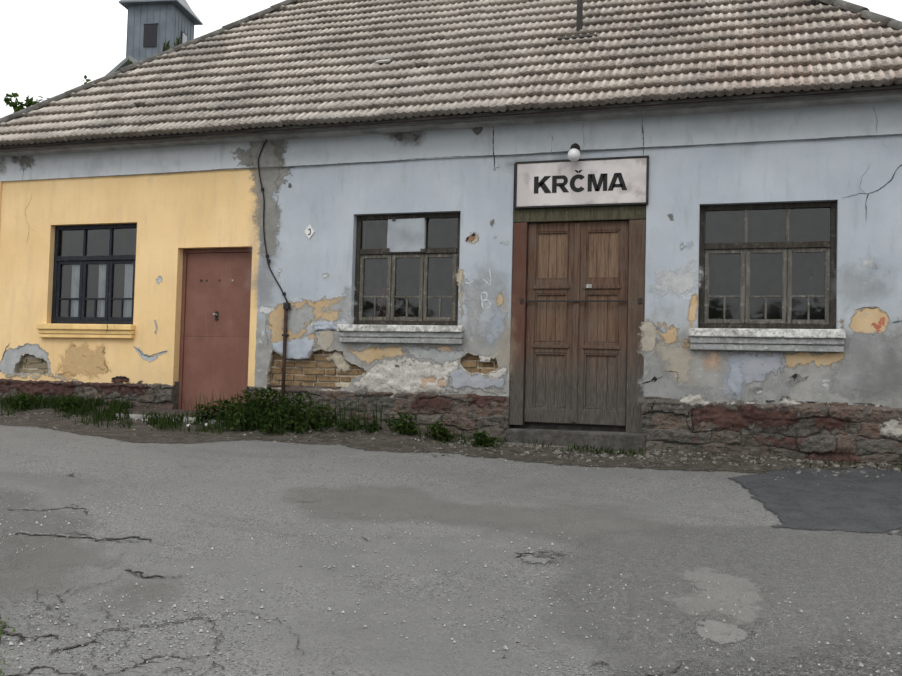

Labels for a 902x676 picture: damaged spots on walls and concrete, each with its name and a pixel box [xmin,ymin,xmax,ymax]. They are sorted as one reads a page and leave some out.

crack [16,107,902,240]
peeling [0,343,149,397]
peeling [134,346,167,362]
flaking render [259,296,508,411]
peeling [638,261,852,434]
peeling [840,306,890,334]